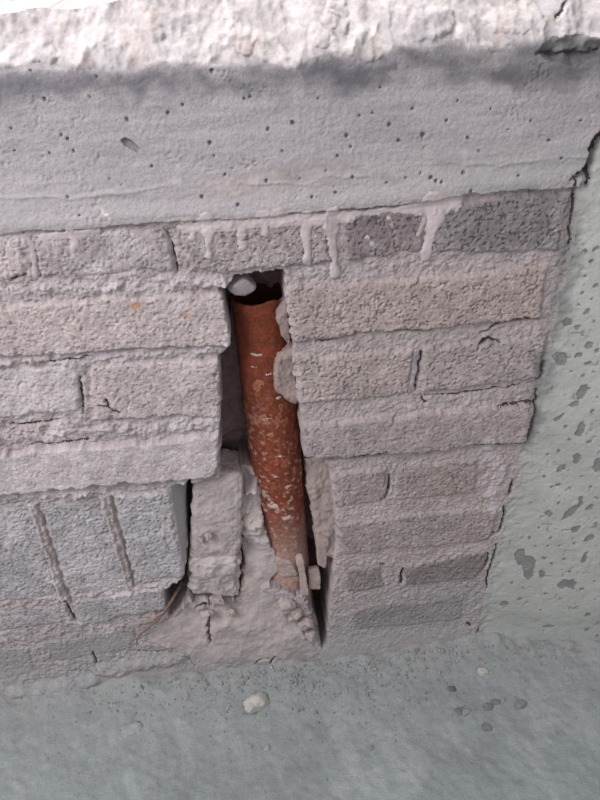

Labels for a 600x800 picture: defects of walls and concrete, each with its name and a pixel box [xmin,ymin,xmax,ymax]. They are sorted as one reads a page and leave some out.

crack [567,131,600,243]
crack [478,317,531,345]
crack [50,355,120,413]
crack [414,350,542,421]
crack [12,419,89,444]
spalling [187,448,244,597]
crack [196,602,215,641]